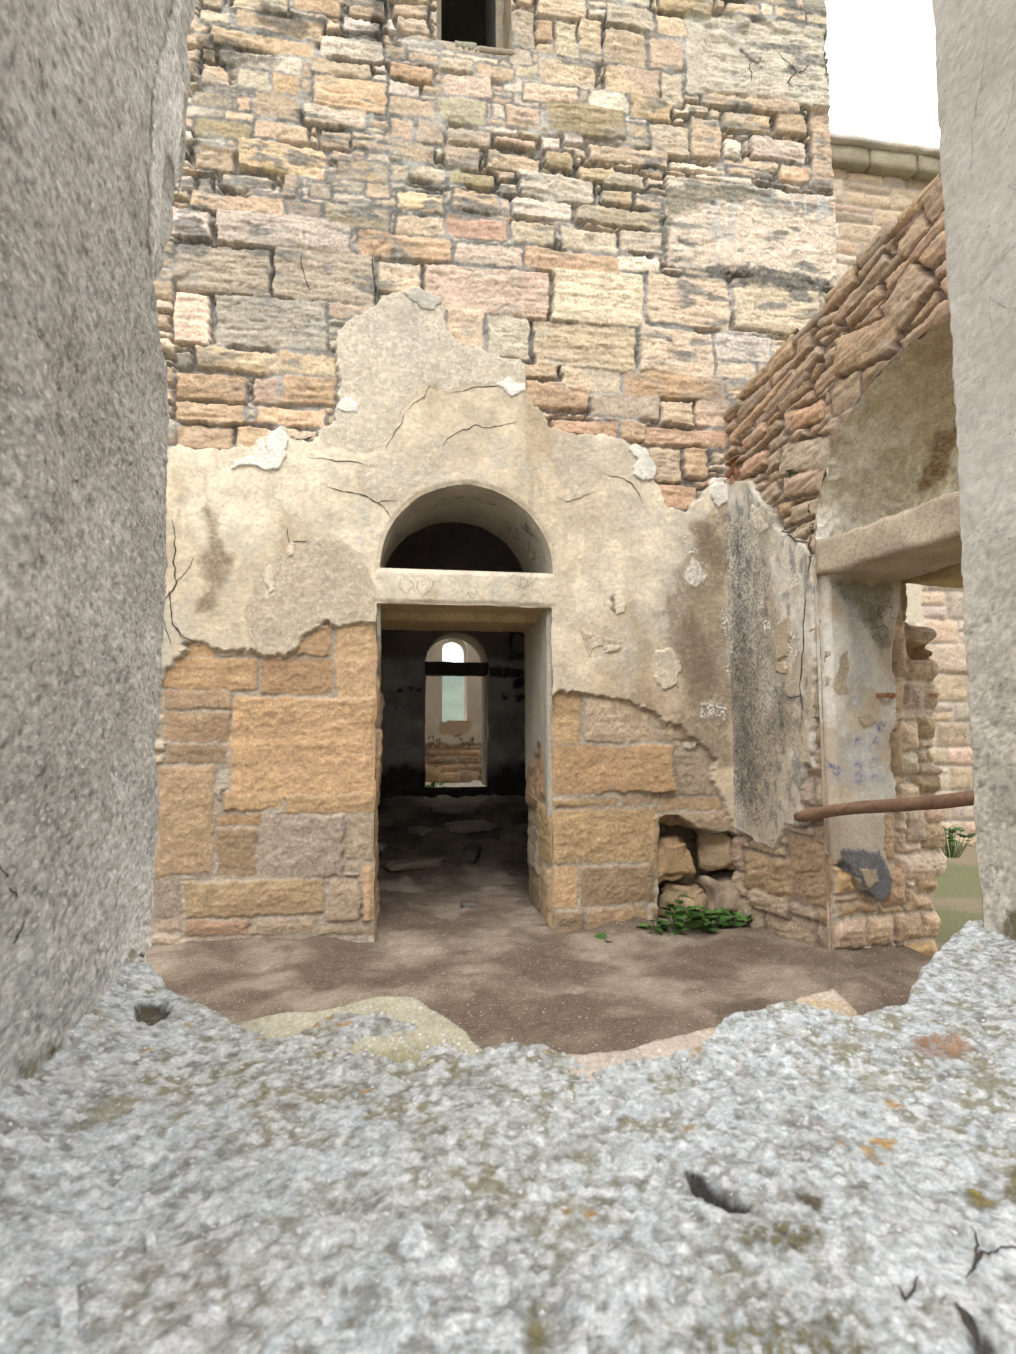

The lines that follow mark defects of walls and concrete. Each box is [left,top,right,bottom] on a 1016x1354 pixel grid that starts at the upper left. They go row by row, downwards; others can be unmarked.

flaking render [321,287,525,452]
flaking render [231,426,289,471]
crack [290,385,497,523]
crack [444,421,516,444]
flaking render [628,446,656,482]
damp [199,520,232,610]
flaking render [654,647,682,691]
damp [667,507,790,816]
spalling [139,539,378,958]
spalling [551,689,741,933]
crack [0,866,25,944]
spalling [134,1005,170,1026]